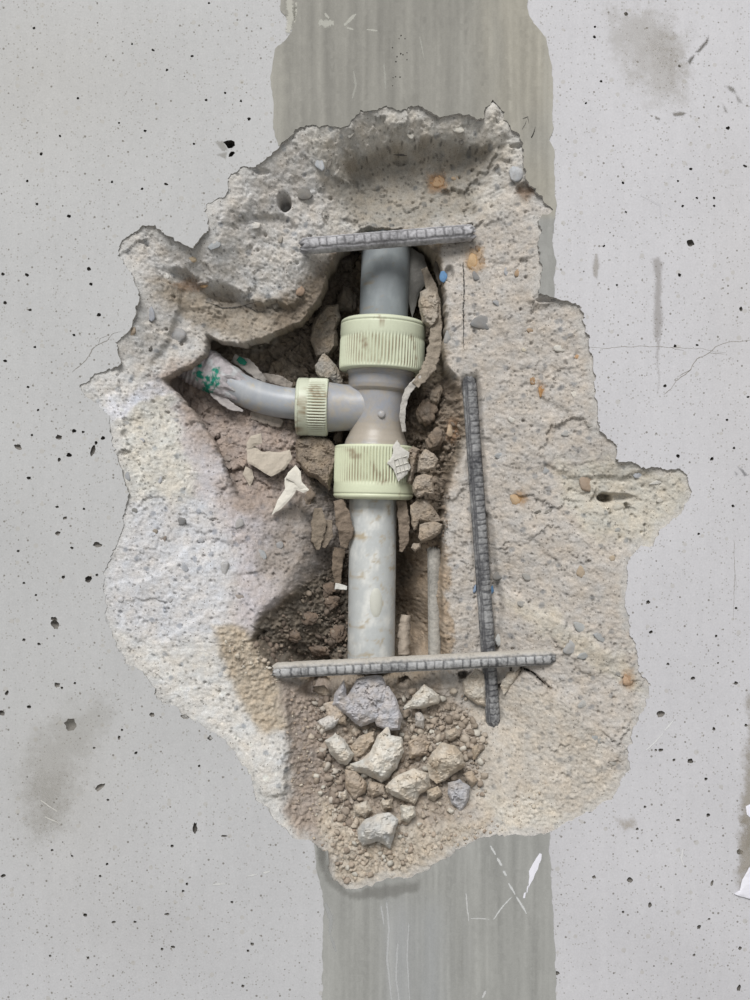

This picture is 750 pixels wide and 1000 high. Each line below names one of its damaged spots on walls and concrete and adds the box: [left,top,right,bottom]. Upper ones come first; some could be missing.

spalling [80,101,691,839]
crack [585,340,748,394]